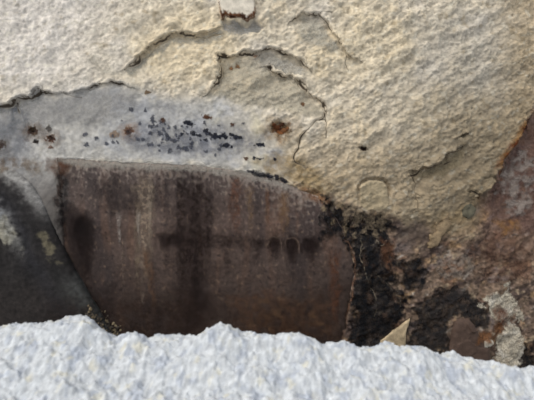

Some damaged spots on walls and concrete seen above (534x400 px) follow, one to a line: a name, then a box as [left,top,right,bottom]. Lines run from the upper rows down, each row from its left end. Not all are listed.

crack [0,26,224,114]
mould [136,115,243,157]
spalling [125,20,261,74]
spalling [203,44,328,114]
crack [203,46,328,169]
corrosion [270,122,291,136]
damp [54,174,91,268]
efflorescence [478,282,525,366]